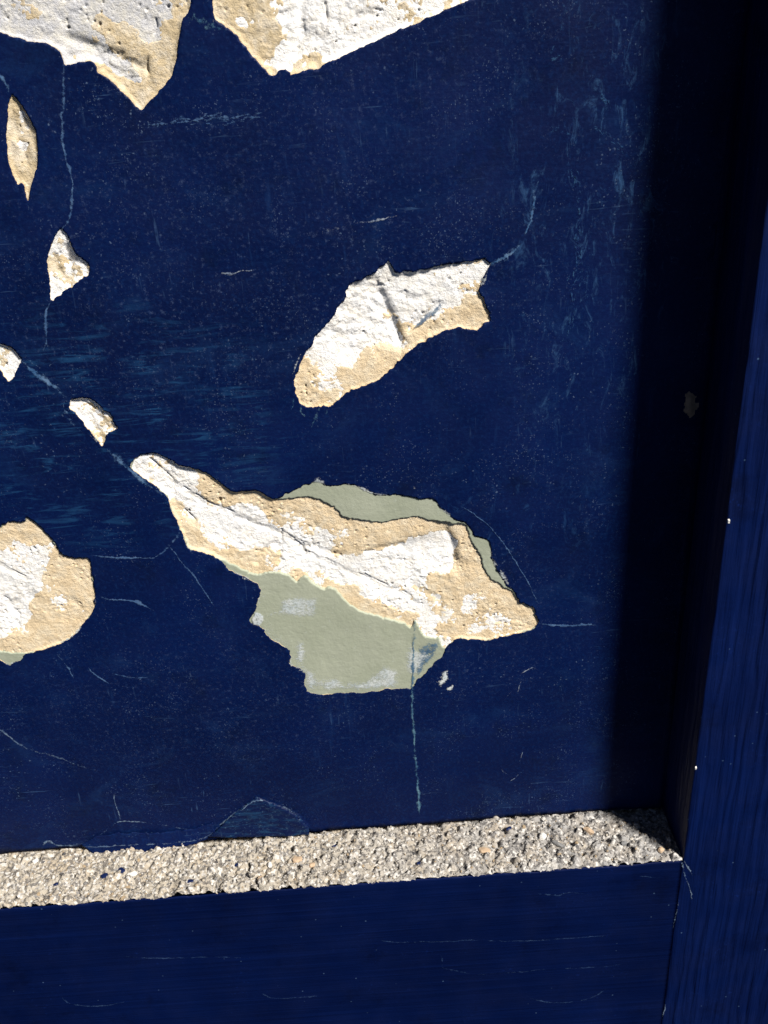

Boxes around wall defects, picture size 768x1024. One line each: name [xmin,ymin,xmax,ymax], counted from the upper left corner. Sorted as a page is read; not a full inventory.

peeling [0,0,191,110]
peeling [213,0,468,76]
peeling [6,95,38,200]
peeling [47,229,90,300]
peeling [0,344,21,381]
peeling [294,259,491,407]
peeling [69,397,117,446]
peeling [0,518,95,665]
peeling [130,453,538,695]
crack [410,622,420,809]